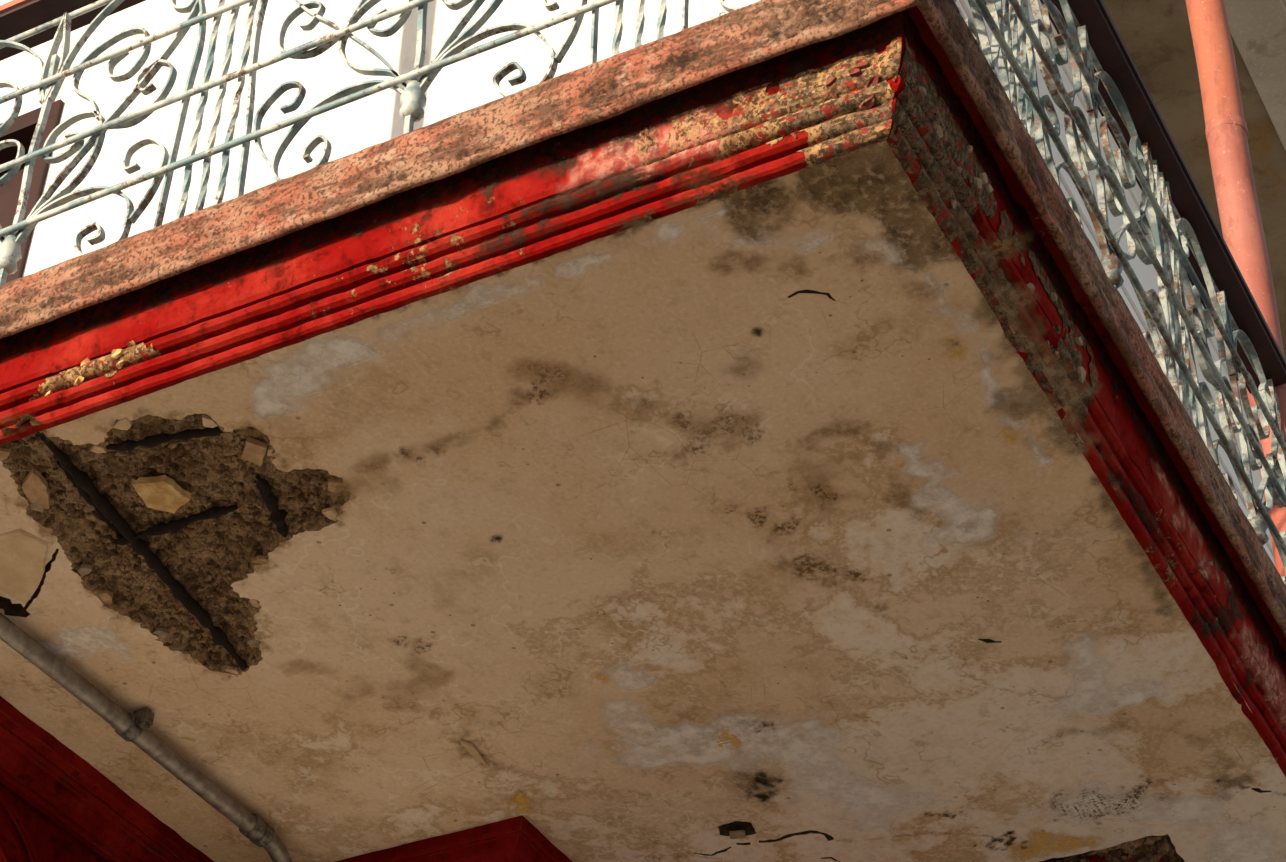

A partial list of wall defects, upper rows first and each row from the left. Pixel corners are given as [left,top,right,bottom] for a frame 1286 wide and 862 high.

peeling [514,156,577,177]
water stain [474,218,554,262]
water stain [609,211,681,240]
peeling [616,34,1098,432]
water stain [671,143,1093,454]
water stain [254,338,375,416]
spalling [0,340,352,677]
water stain [888,446,997,543]
water stain [606,666,934,830]
crack [693,830,840,862]
flaking render [1010,832,1185,862]